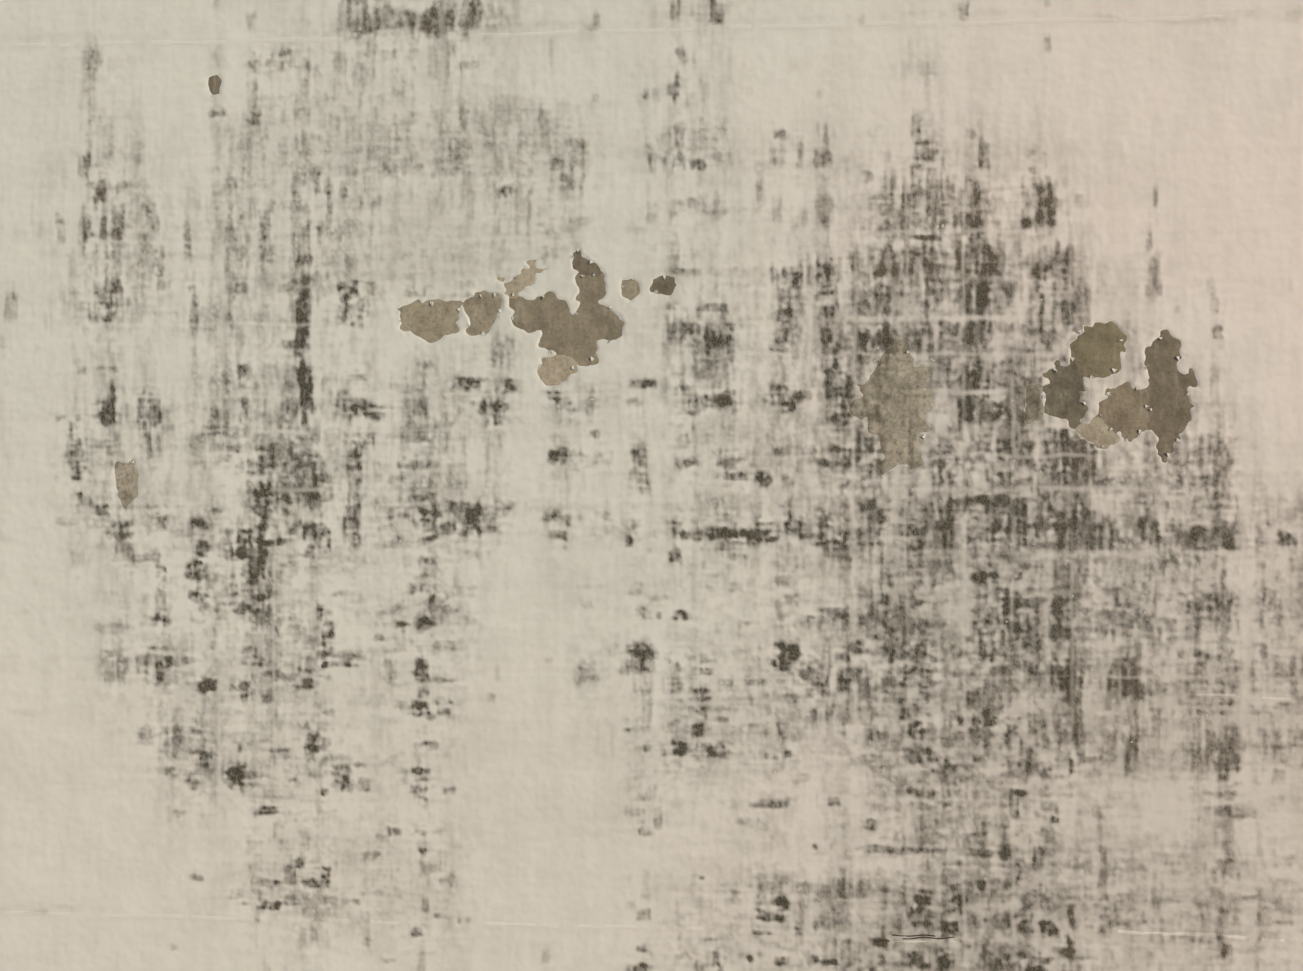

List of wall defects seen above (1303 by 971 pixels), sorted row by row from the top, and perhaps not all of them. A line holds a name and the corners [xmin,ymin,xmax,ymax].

peeling [208,75,222,96]
peeling [397,248,676,386]
mould [99,384,116,426]
peeling [115,459,139,509]
mould [186,508,217,597]
leakage [230,255,380,629]
mould [390,493,496,541]
leakage [458,377,516,425]
peeling [849,335,933,475]
leakage [668,129,1240,806]
peeling [1025,321,1198,463]
leakage [813,790,1079,971]